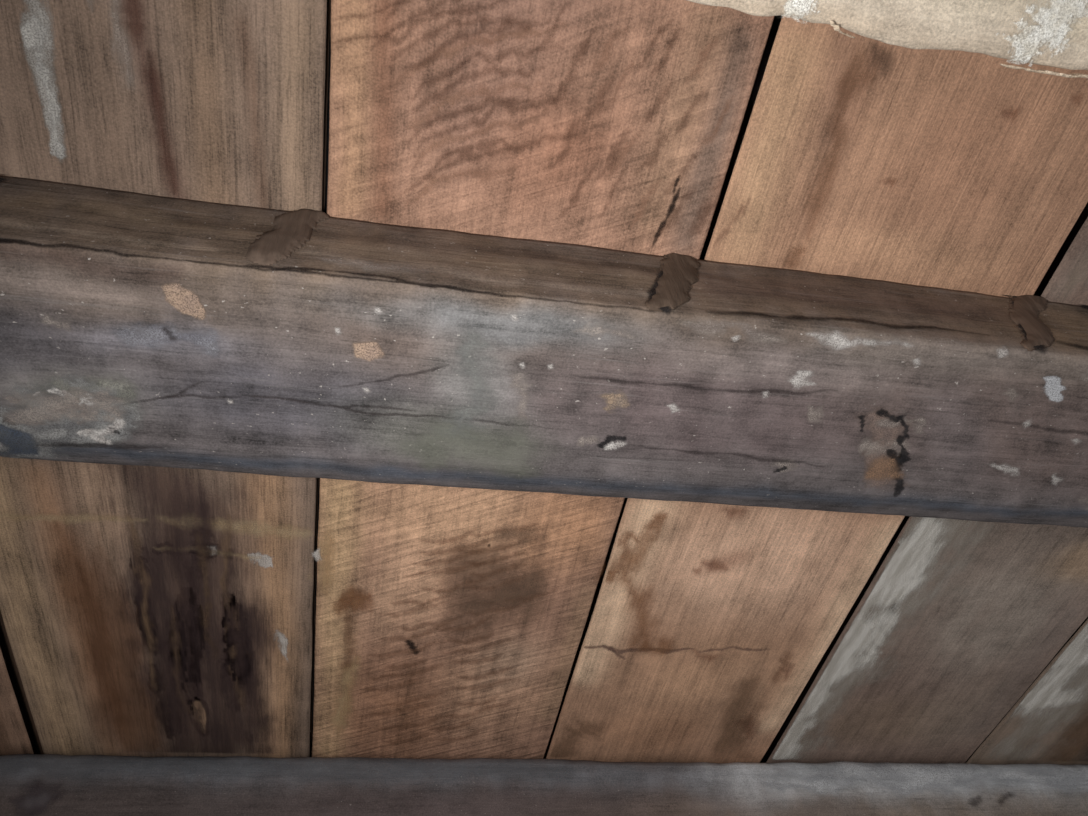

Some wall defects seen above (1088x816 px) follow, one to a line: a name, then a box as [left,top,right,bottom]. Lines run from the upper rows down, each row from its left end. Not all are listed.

peeling [0,377,145,458]
damp [124,466,271,752]
crack [586,645,761,658]
damp [773,517,946,760]
damp [997,663,1088,758]